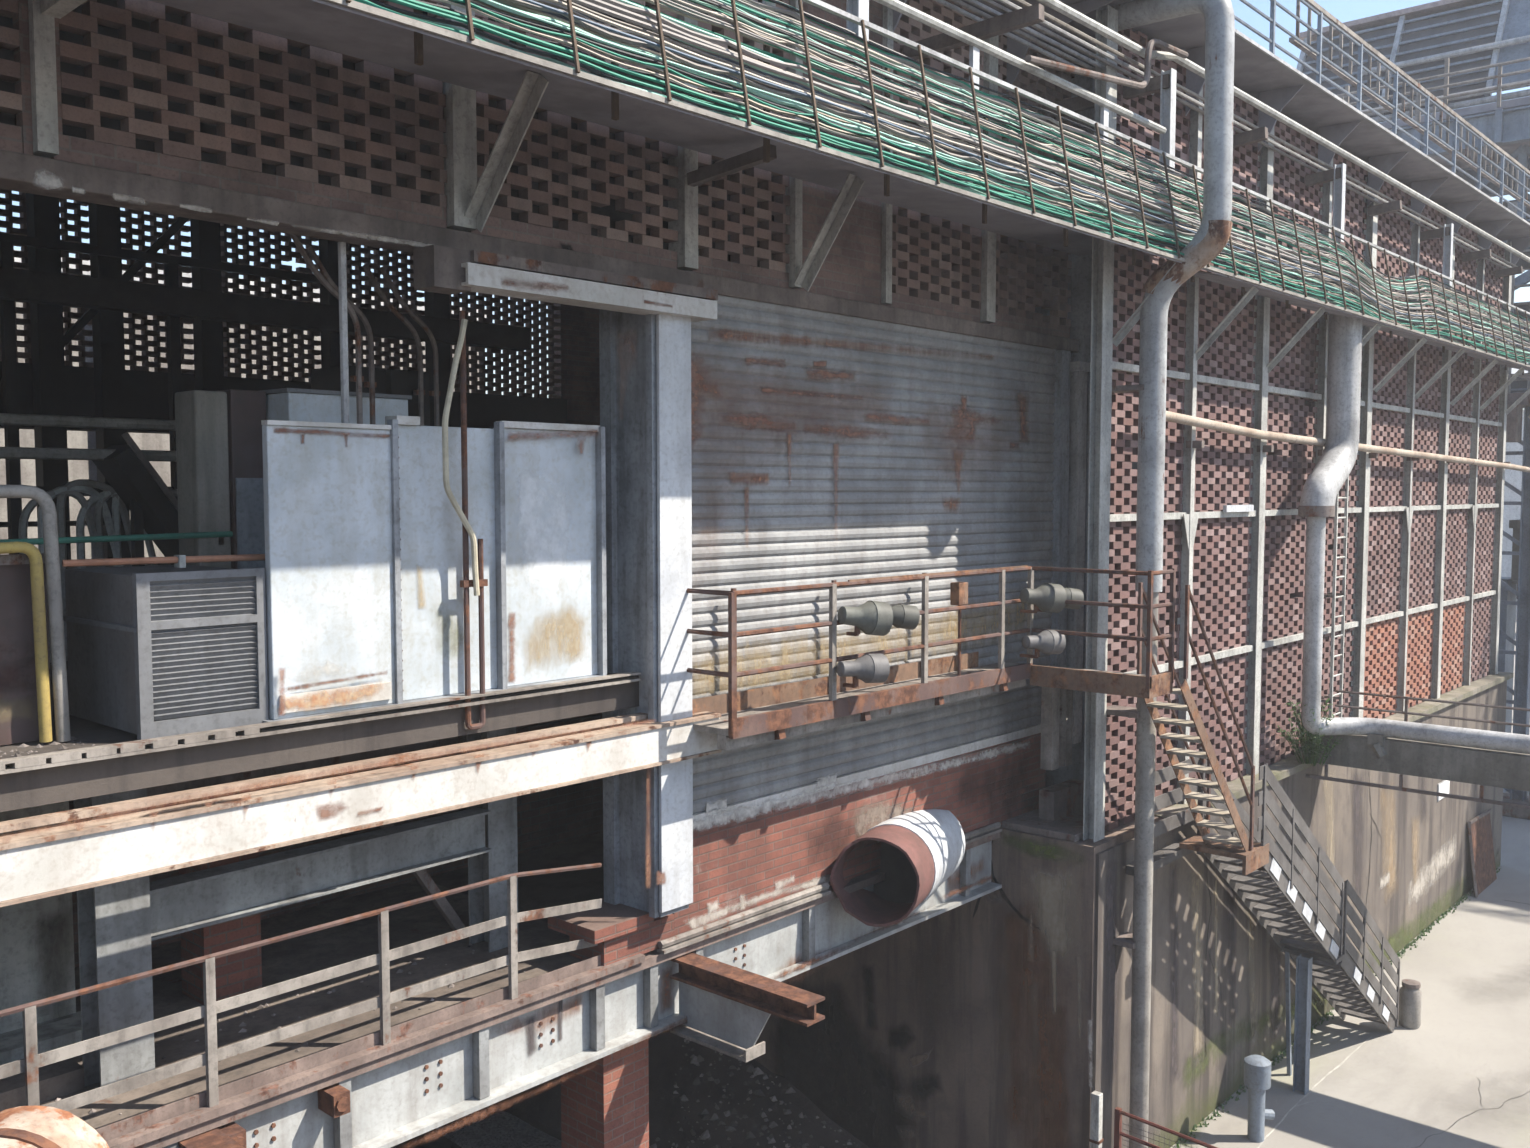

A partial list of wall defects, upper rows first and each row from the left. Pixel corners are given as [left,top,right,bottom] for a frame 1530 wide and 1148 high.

rust [691,361,719,443]
rust [722,330,929,490]
rust [279,669,384,715]
rust [319,757,417,818]
rust [36,806,156,832]
leakage [1353,777,1362,897]
rust [777,951,838,981]
leakage [1030,872,1073,1013]
rust [424,1097,522,1140]